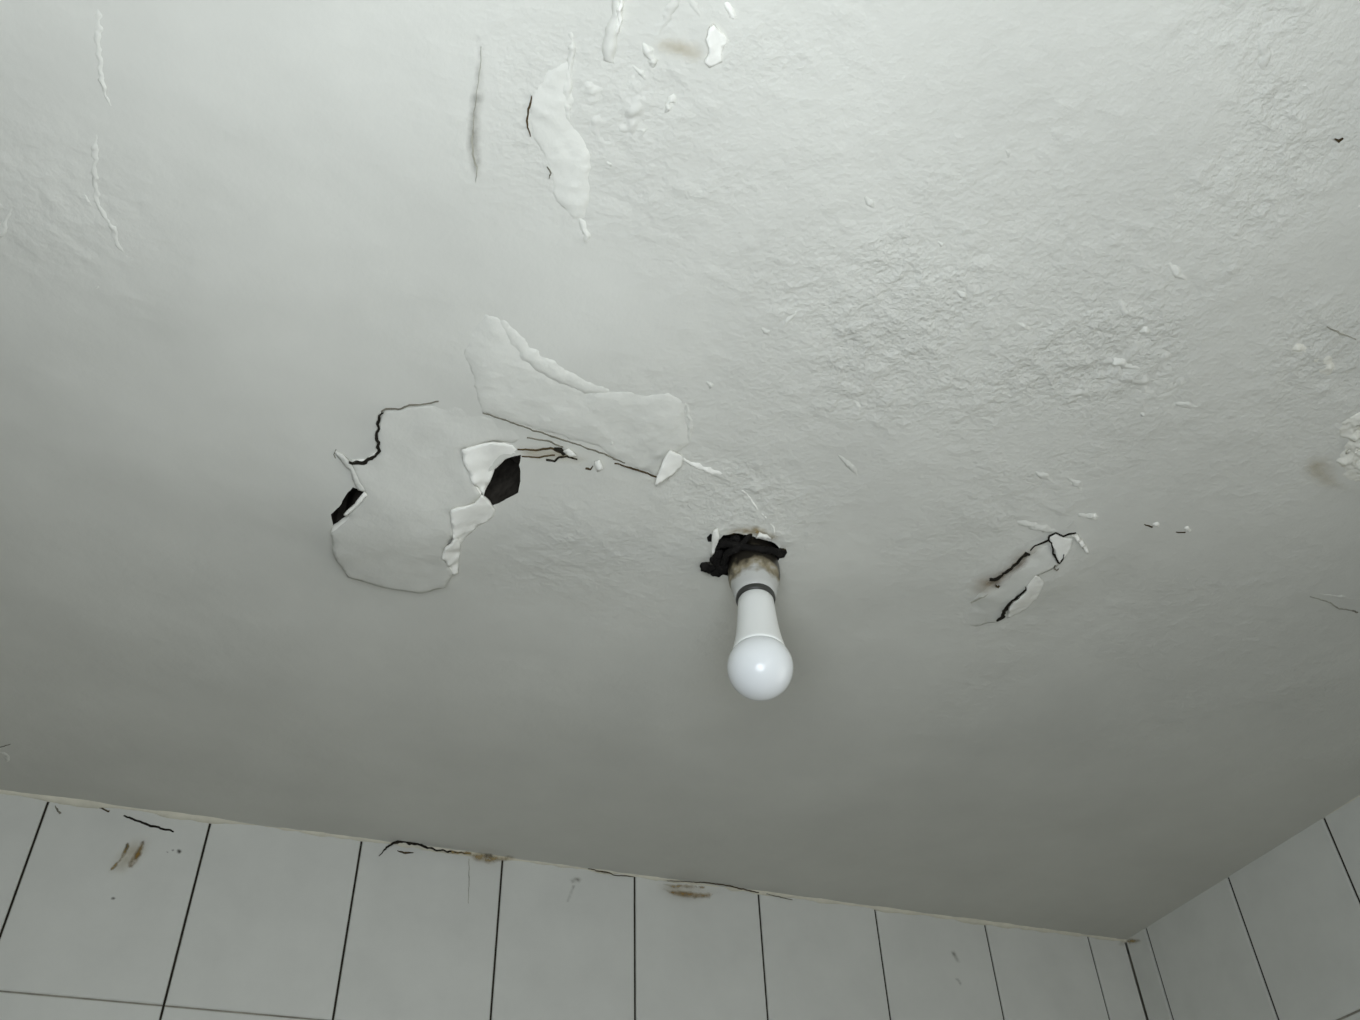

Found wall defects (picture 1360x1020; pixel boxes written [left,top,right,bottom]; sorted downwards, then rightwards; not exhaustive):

peeling [704,24,727,68]
crack [471,51,481,181]
peeling [526,32,591,243]
peeling [331,401,521,593]
spalling [963,513,1099,626]
crack [1310,594,1359,613]